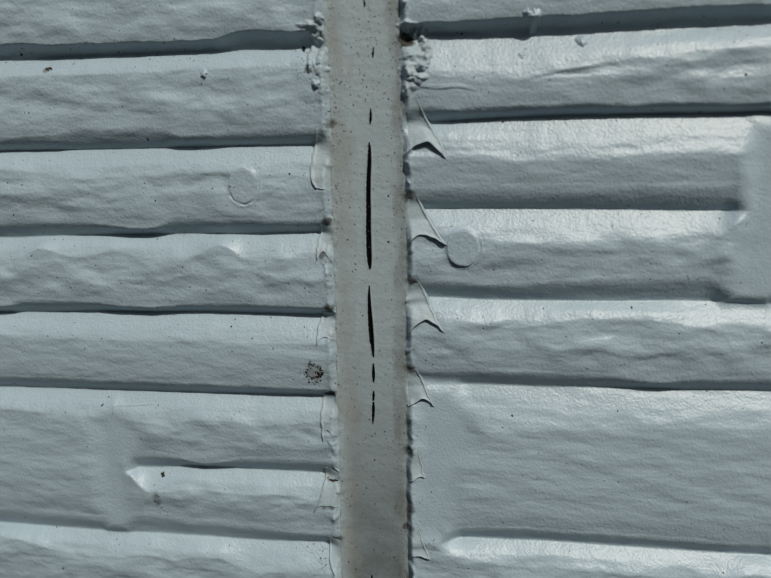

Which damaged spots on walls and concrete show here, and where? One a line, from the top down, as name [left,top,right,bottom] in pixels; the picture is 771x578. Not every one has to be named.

peeling [405,94,447,159]
peeling [309,126,331,191]
peeling [315,224,334,263]
peeling [407,192,447,245]
crack [365,108,376,437]
peeling [408,279,446,334]
peeling [407,368,434,406]
peeling [320,393,339,440]
peeling [313,467,341,512]
peeling [408,528,431,560]